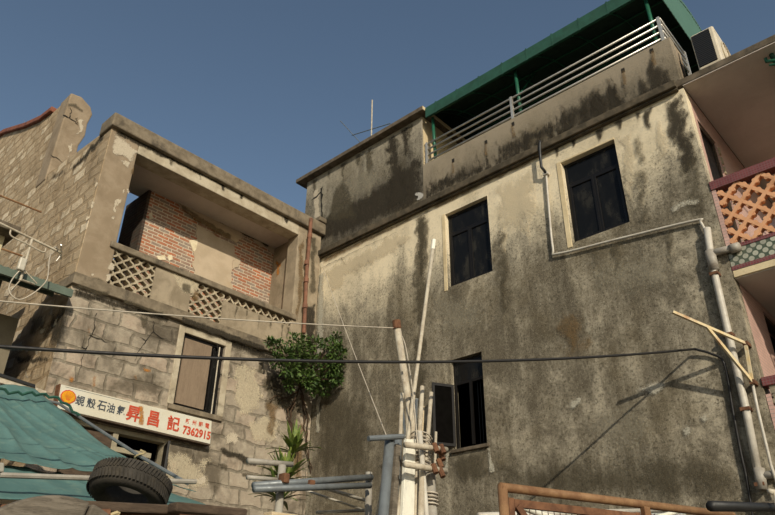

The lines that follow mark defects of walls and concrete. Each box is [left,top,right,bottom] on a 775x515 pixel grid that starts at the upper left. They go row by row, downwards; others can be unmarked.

leakage [638,60,671,96]
flaking render [112,133,137,173]
leakage [617,119,646,220]
leakage [636,94,703,213]
flaking render [174,201,275,300]
leakage [296,79,626,377]
crack [78,313,107,375]
leakage [415,339,427,404]
leakage [316,391,371,476]